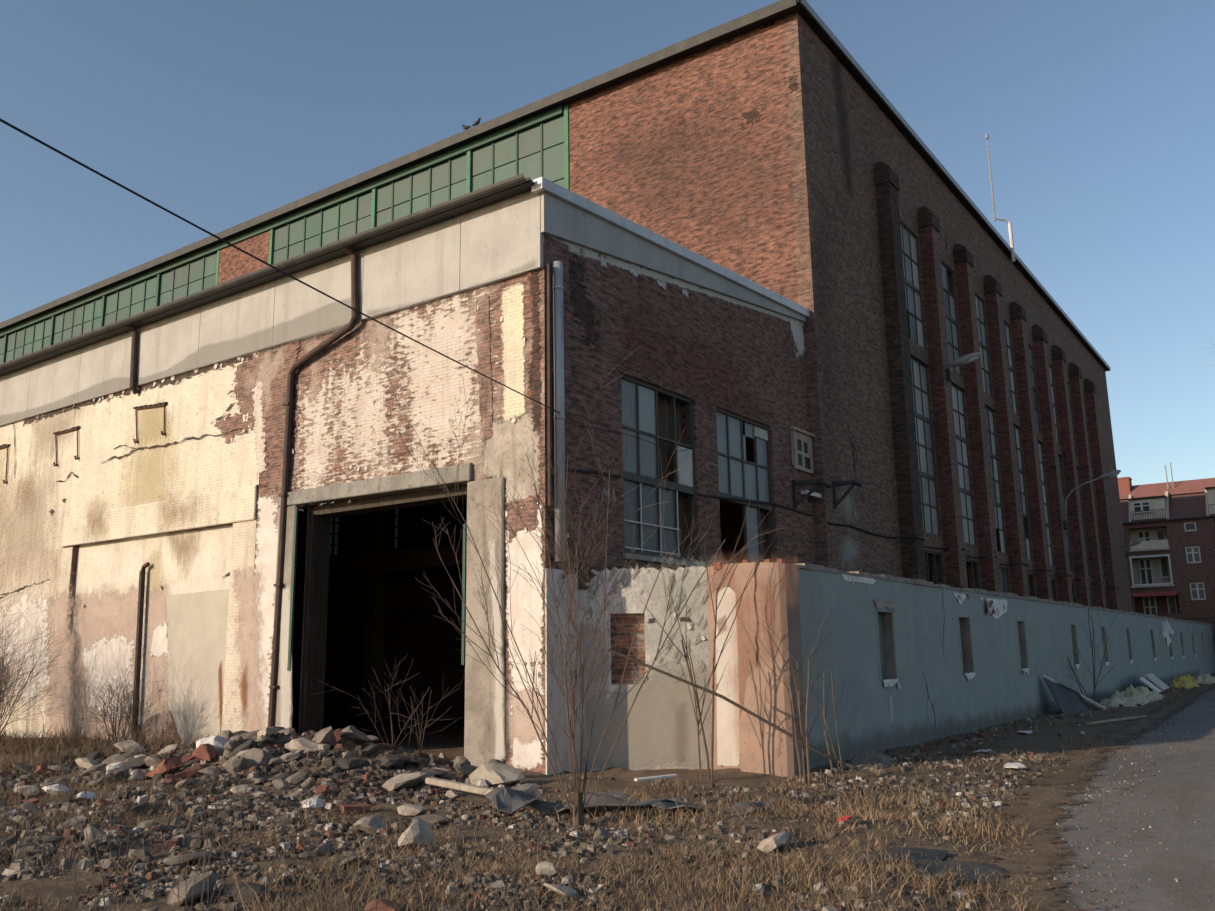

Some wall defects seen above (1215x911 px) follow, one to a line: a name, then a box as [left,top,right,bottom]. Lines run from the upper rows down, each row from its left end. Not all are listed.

spalling [543,236,806,358]
crack [56,403,241,482]
peeling [0,270,544,770]
peeling [562,533,639,621]
spalling [954,592,1008,619]